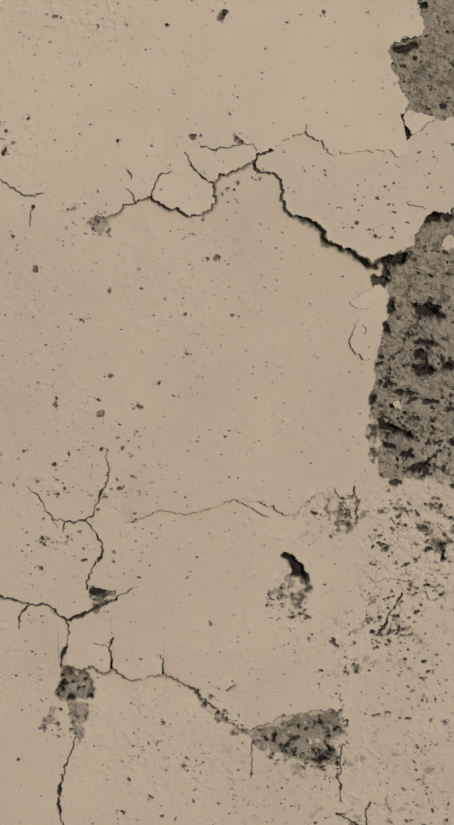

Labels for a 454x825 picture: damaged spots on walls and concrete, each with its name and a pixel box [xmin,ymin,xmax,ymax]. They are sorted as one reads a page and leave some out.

crack [0,178,45,228]
spalling [46,0,454,642]
crack [0,447,134,670]
crack [157,654,165,676]
spalling [0,554,355,768]
crack [55,735,77,825]
crack [248,740,256,779]